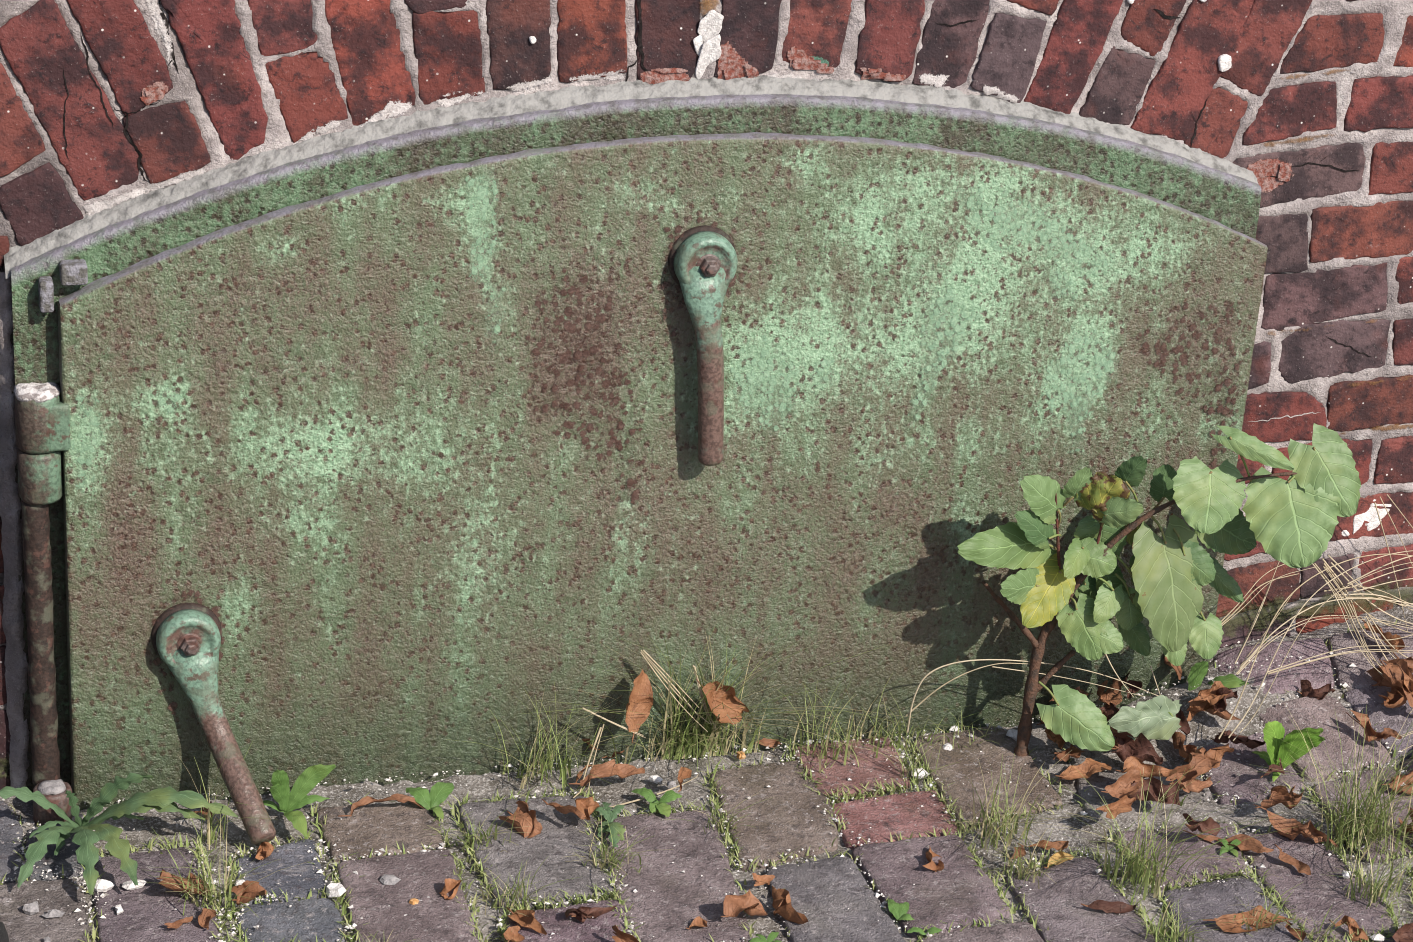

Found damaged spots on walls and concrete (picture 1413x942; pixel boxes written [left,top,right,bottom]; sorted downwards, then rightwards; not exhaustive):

flaking render [640,10,759,84]
spalling [1247,158,1294,193]
rust [521,268,649,505]
rust [1136,297,1250,470]
rust [148,590,230,661]